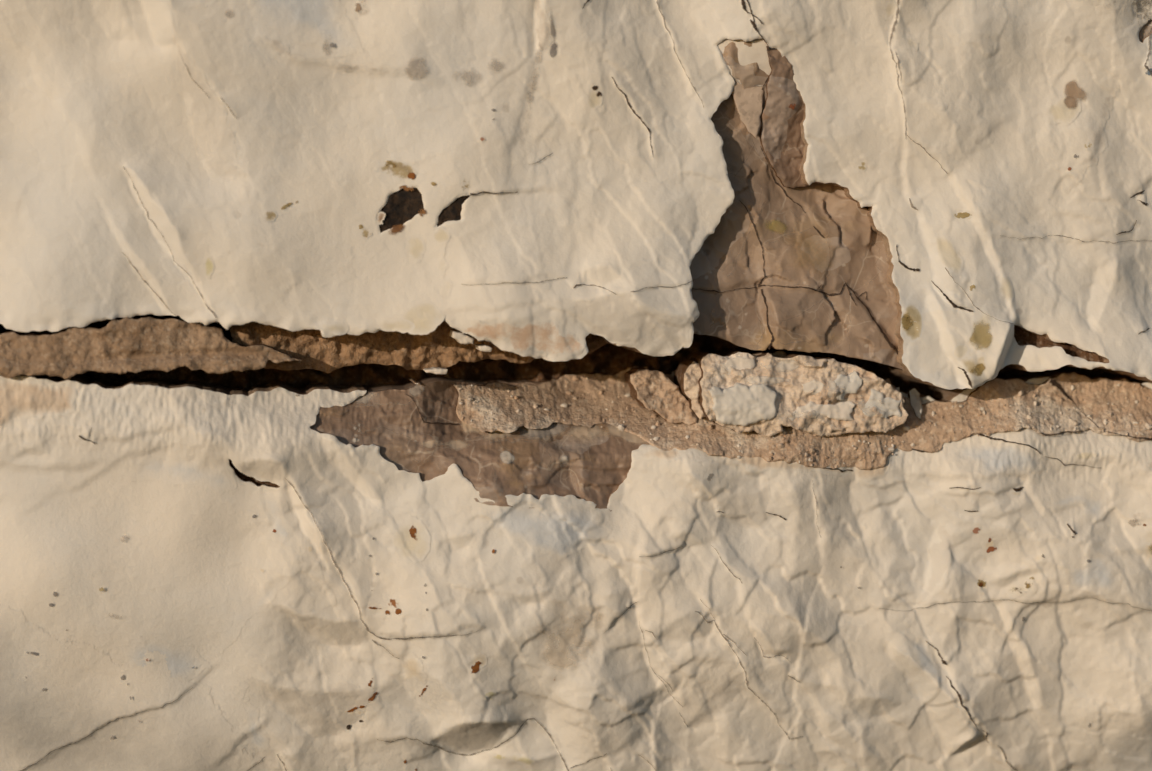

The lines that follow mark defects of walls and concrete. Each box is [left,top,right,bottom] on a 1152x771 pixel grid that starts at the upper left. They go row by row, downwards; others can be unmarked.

crack [890,0,947,173]
crack [0,252,169,332]
crack [123,167,232,338]
spalling [379,188,424,233]
spalling [437,195,470,227]
peeling [449,330,492,352]
crack [83,201,938,425]
spalling [573,41,923,426]
crack [896,245,1152,468]
spalling [310,367,649,511]
spalling [715,475,776,532]